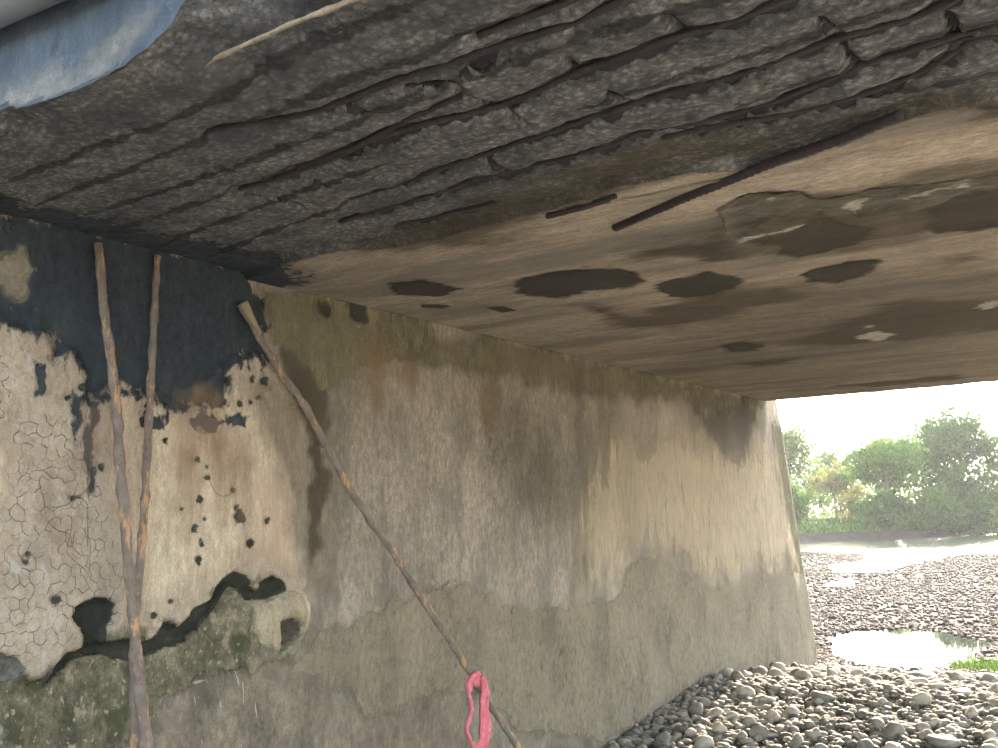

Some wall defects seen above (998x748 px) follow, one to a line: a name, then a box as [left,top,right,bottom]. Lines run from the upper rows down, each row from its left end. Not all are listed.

damp [0,216,272,493]
damp [347,302,367,323]
damp [390,280,462,309]
spalling [0,0,998,392]
damp [515,269,645,298]
damp [594,166,998,327]
damp [797,301,998,344]
crack [0,355,166,656]
peeling [0,322,308,748]
damp [151,334,816,748]